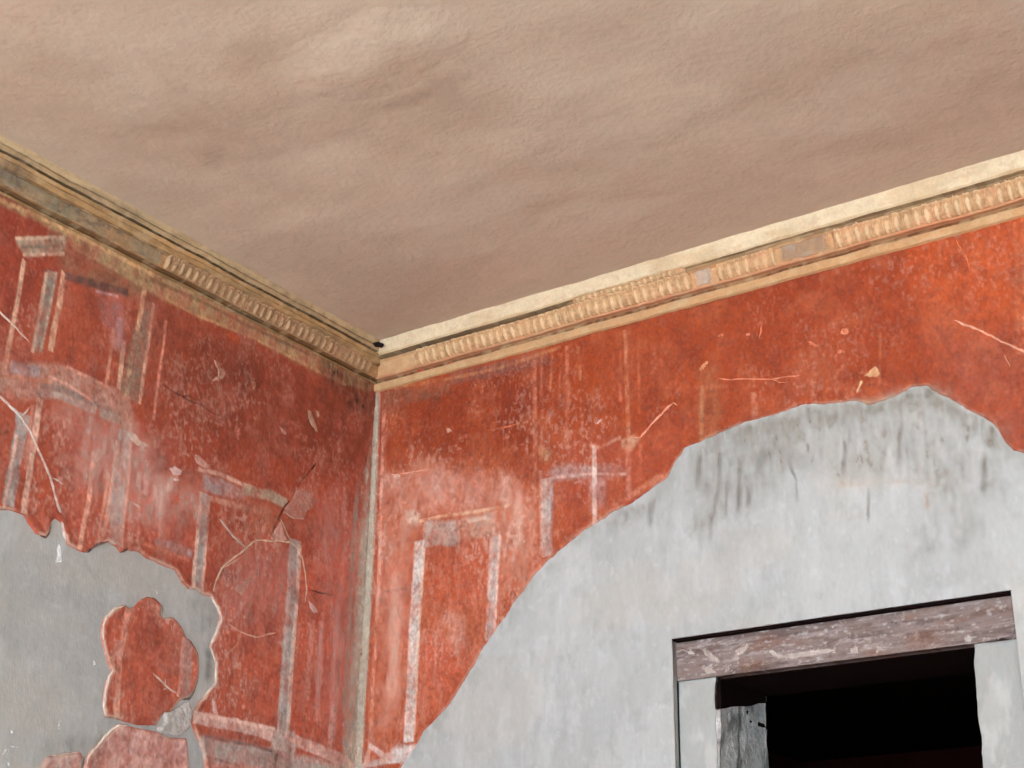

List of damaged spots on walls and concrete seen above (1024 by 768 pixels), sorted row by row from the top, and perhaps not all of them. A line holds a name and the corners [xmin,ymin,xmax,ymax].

crack [9,404,33,436]
flaking render [0,510,222,768]
crack [213,501,328,602]
flaking render [401,381,1024,768]